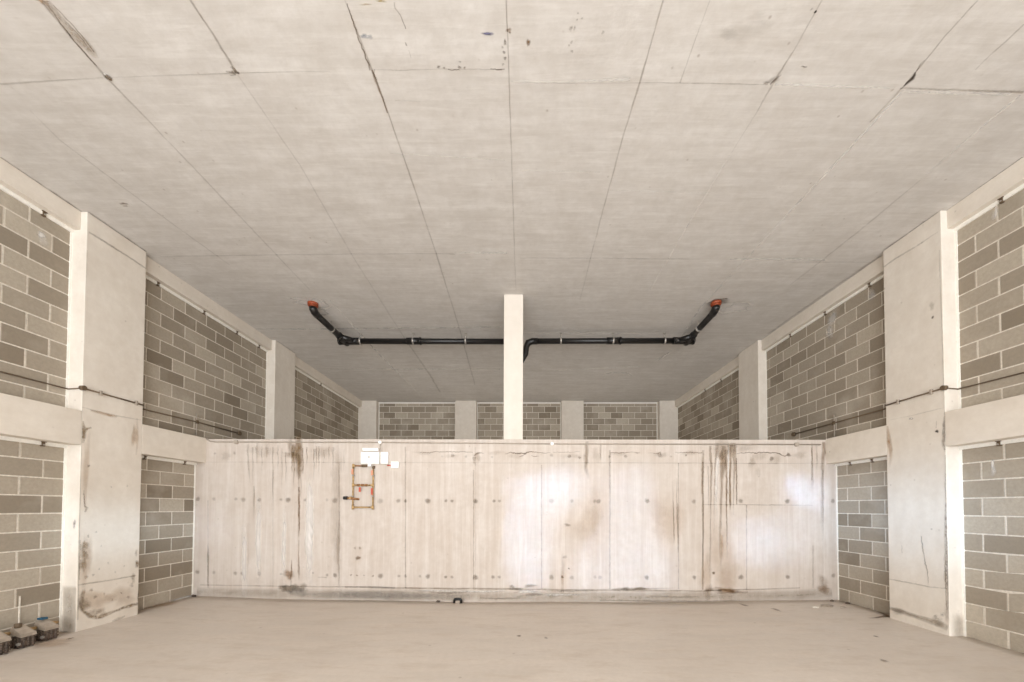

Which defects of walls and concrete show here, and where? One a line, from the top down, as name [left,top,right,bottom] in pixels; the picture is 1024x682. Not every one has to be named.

damp [702,454,737,516]